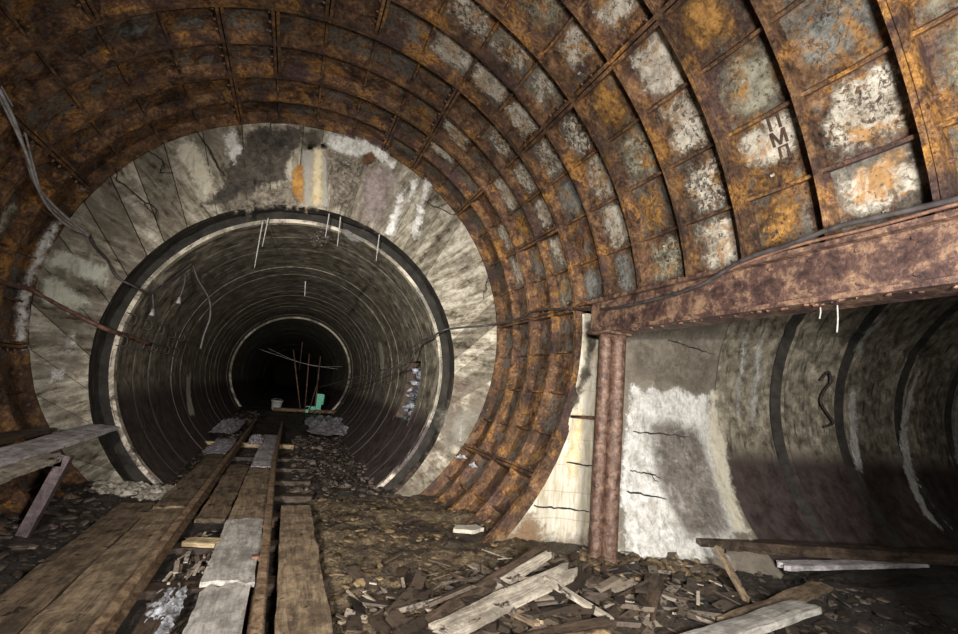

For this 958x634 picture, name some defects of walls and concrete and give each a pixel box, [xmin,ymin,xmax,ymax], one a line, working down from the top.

corrosion [686,0,733,49]
corrosion [594,79,625,128]
leakage [176,125,432,240]
corrosion [292,148,323,206]
corrosion [363,152,377,166]
corrosion [639,188,666,230]
corrosion [756,197,801,244]
corrosion [566,413,582,478]
crack [633,430,688,438]
leakage [620,325,750,562]
crack [627,470,667,500]
corrosion [496,513,543,542]